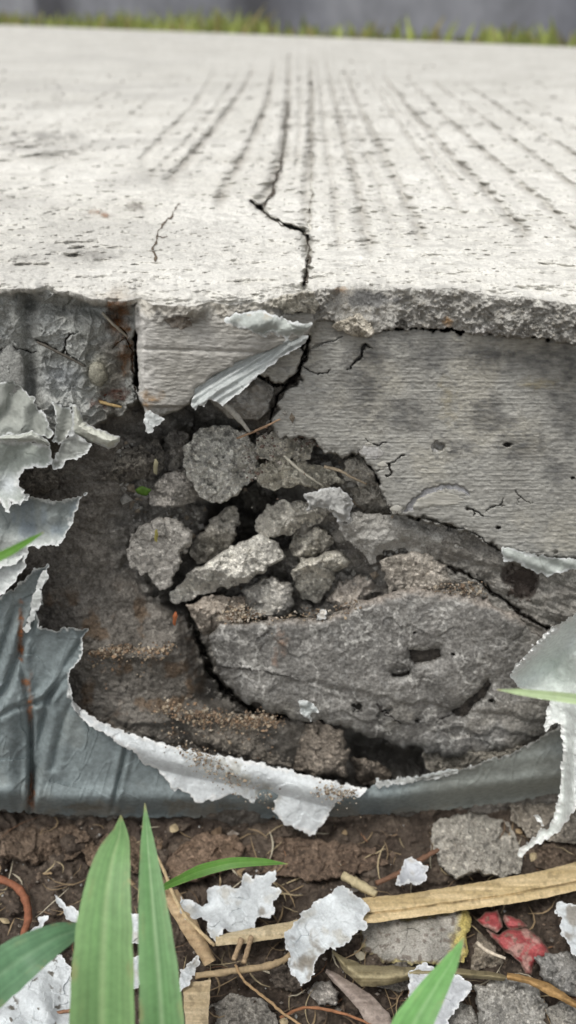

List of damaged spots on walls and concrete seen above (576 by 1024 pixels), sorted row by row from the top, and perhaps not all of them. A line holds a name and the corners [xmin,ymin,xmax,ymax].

crack [255,104,311,286]
crack [151,204,179,261]
crack [342,336,371,369]
crack [260,335,324,423]
spalling [357,442,388,470]
spalling [432,440,453,453]
spalling [390,484,469,514]